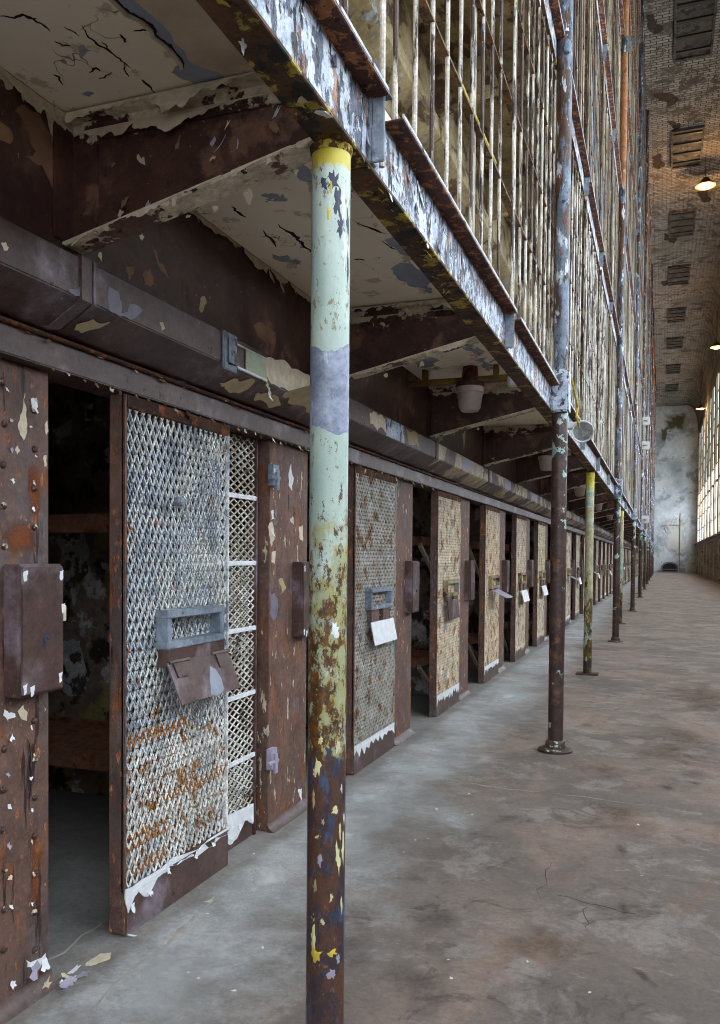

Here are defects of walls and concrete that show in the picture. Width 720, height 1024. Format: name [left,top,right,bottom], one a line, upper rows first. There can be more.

crack [2,13,155,93]
peeling [0,0,273,189]
crack [232,207,311,252]
peeling [290,165,353,284]
crack [357,223,397,250]
peeling [220,357,310,413]
corrosion [28,467,40,513]
corrosion [127,717,190,750]
corrosion [162,763,226,803]
corrosion [126,816,169,877]
peeling [124,803,254,913]
crack [536,862,636,931]